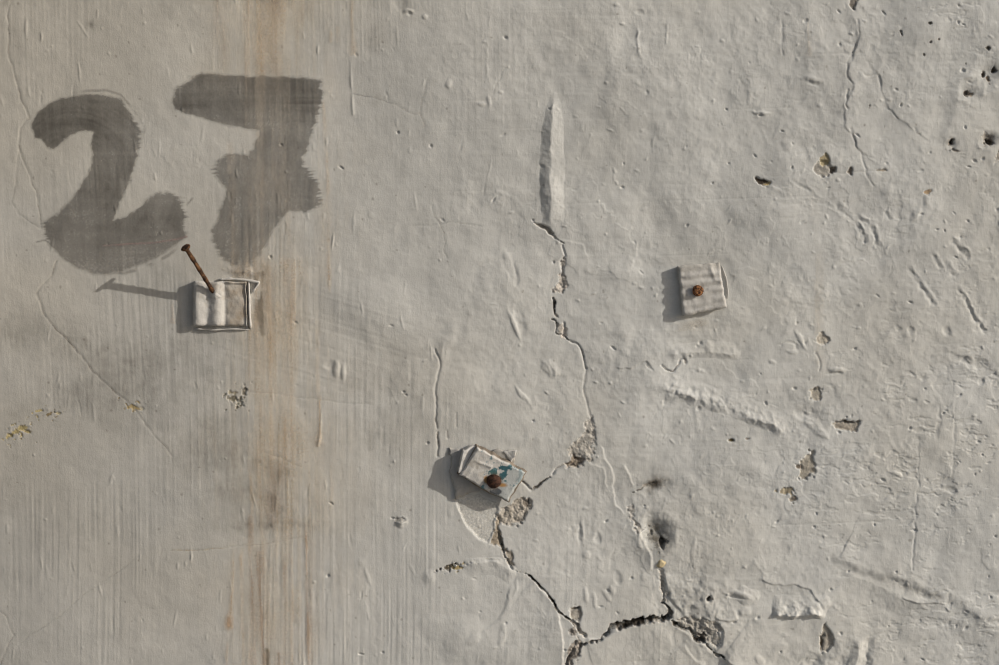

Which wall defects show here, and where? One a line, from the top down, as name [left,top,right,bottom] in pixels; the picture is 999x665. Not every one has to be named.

peeling [813,153,853,178]
spalling [983,132,999,160]
crack [551,297,584,358]
peeling [223,383,247,411]
spalling [566,417,596,468]
peeling [774,449,816,504]
peeling [436,495,532,585]
crack [500,535,725,665]
peeling [820,624,834,651]